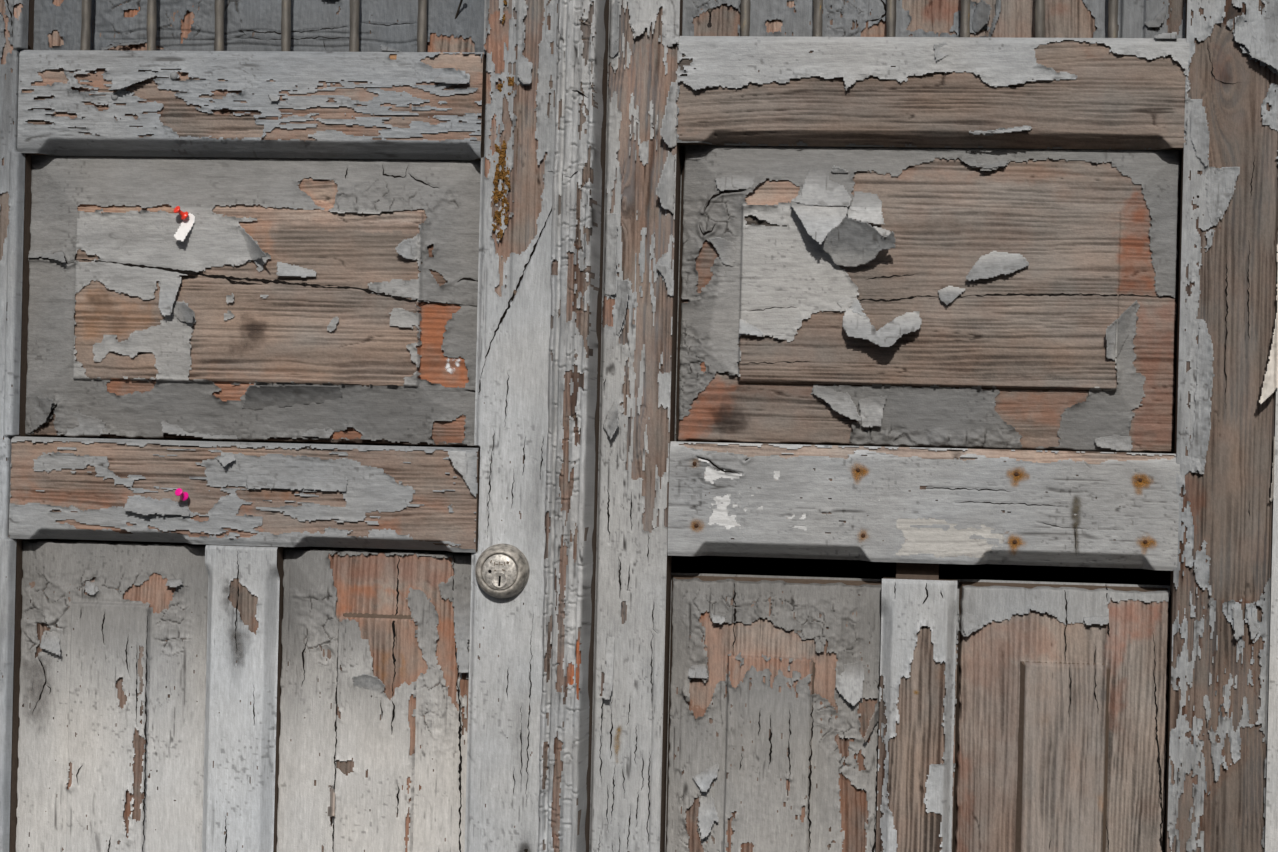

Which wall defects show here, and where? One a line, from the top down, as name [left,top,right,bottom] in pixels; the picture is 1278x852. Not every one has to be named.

corrosion [1133,475,1148,491]
peeling [594,637,615,704]